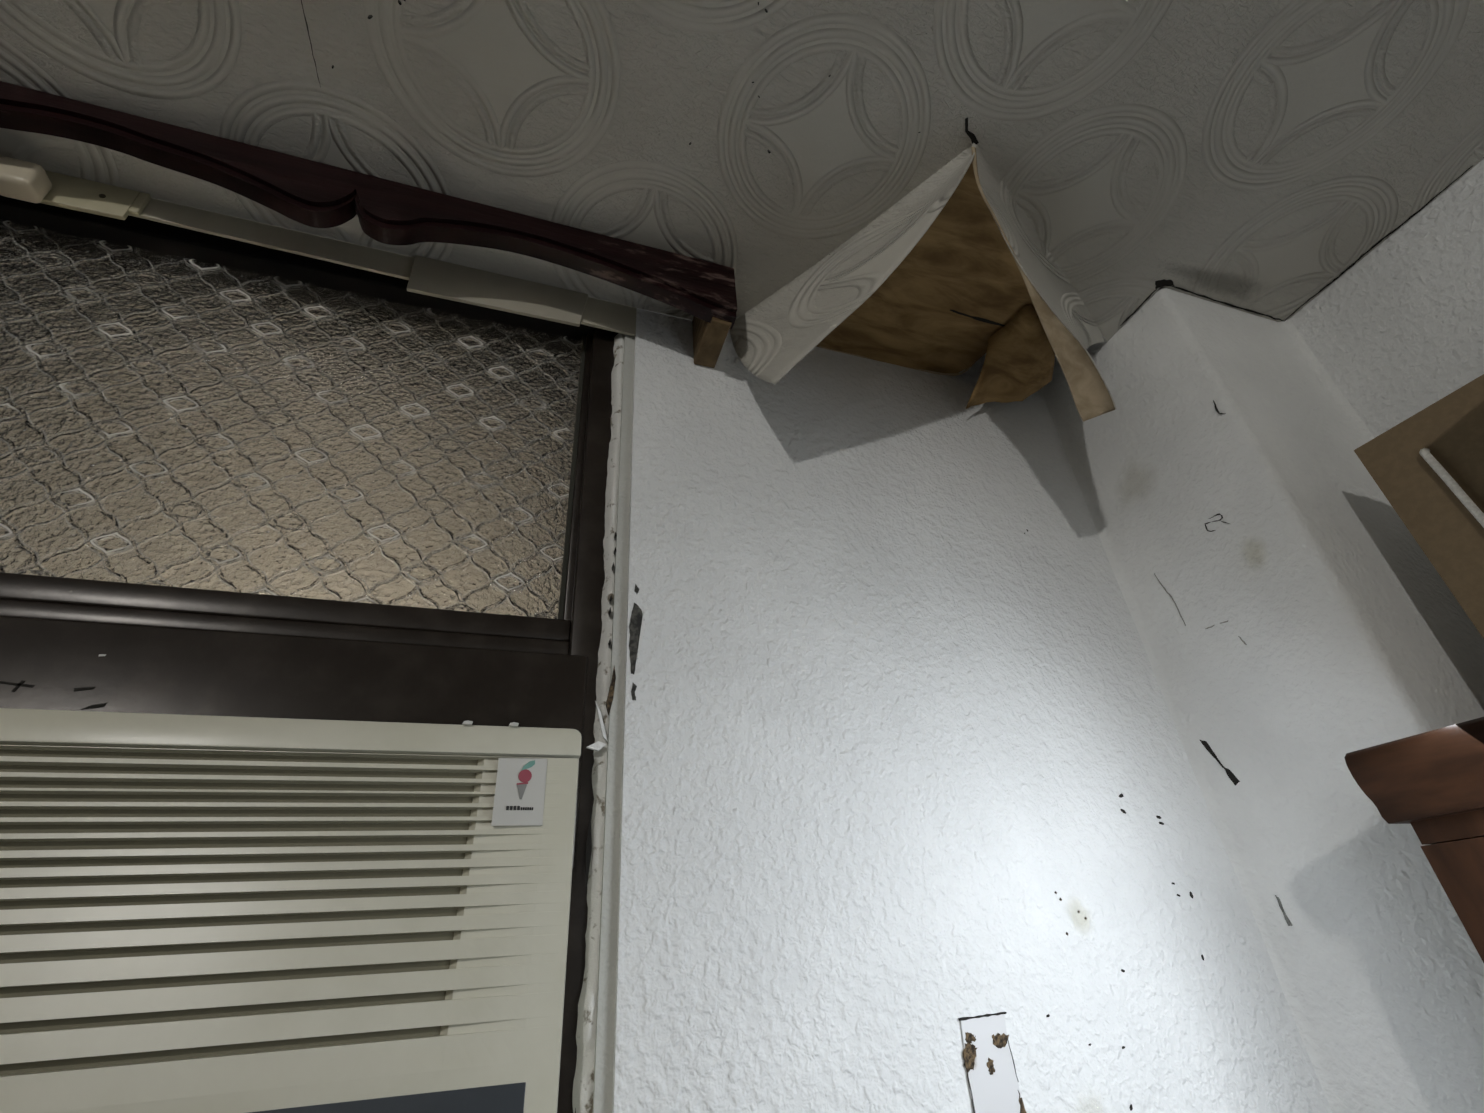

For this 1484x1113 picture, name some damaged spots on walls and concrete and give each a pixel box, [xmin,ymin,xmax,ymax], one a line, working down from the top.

peeling [729,118,1117,422]
spalling [629,584,645,700]
rust [958,1012,1009,1075]